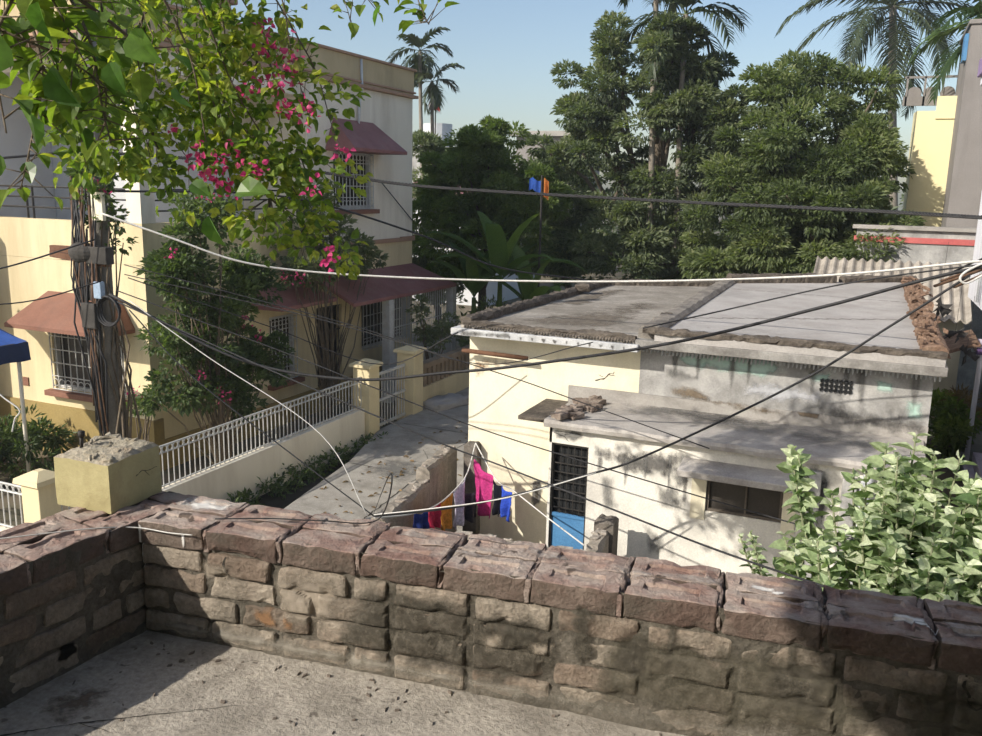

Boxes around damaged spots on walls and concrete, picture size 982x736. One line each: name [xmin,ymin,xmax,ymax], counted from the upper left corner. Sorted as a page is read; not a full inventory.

water stain [598,451,688,506]
water stain [650,535,660,550]
spalling [58,643,77,661]